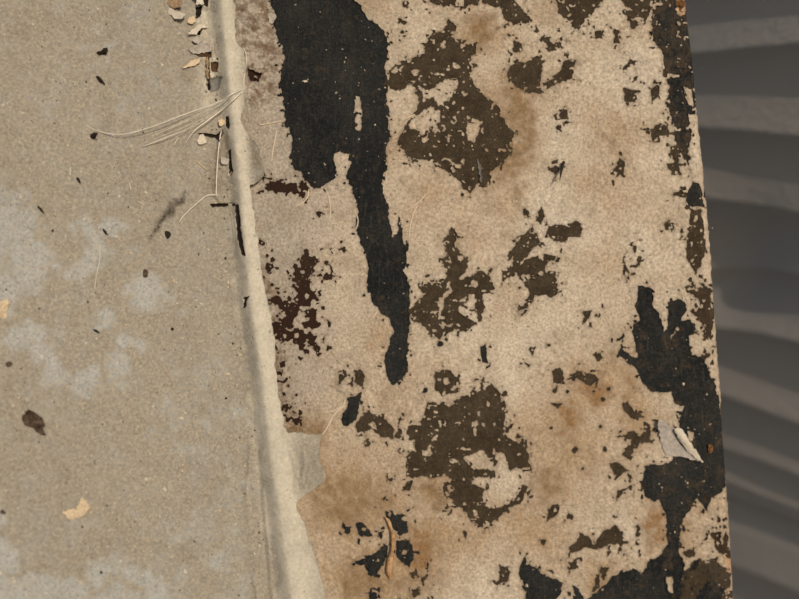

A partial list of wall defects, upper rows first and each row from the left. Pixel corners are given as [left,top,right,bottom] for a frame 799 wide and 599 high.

spalling [248,68,262,82]
peeling [256,0,583,385]
peeling [423,0,696,175]
peeling [610,151,625,186]
peeling [259,238,347,430]
peeling [338,345,533,599]
peeling [492,182,733,599]